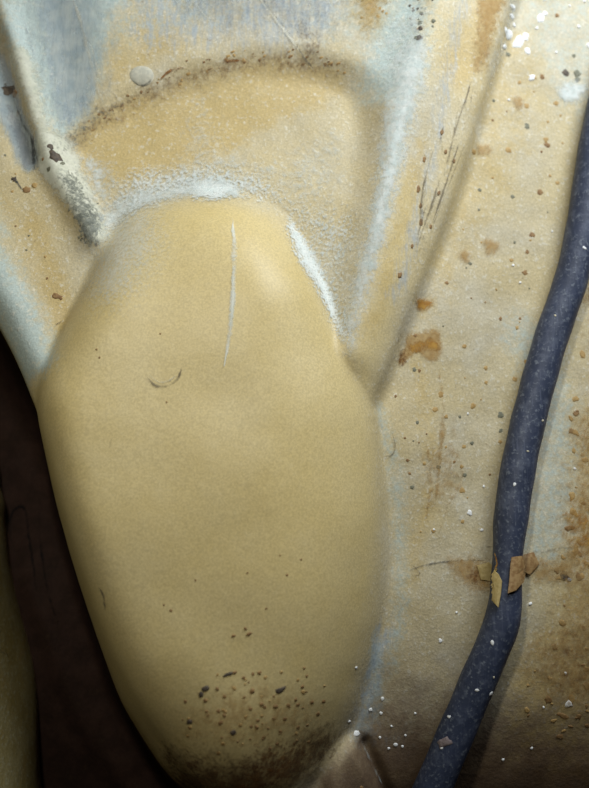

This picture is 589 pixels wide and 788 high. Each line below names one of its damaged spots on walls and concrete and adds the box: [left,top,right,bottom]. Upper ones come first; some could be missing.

mould [63,175,105,246]
corrosion [399,325,444,363]
corrosion [569,396,580,436]
corrosion [164,667,332,788]